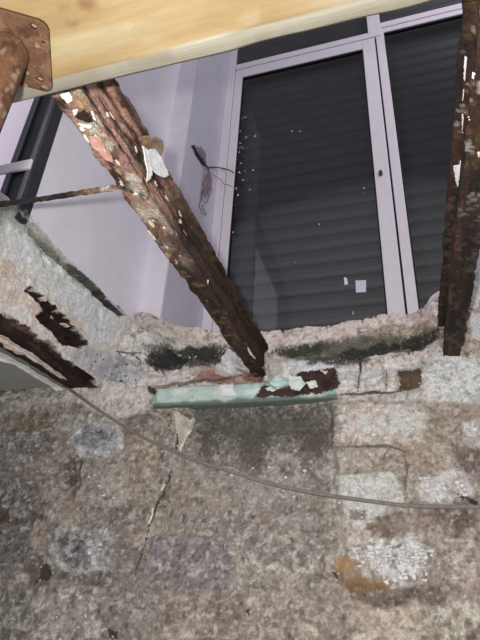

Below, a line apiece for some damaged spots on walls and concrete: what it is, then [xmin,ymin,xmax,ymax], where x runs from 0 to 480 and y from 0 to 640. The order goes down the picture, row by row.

peeling [60,92,125,186]
flaking render [0,335,67,392]
corrosion [0,314,99,389]
peeling [24,288,150,384]
leakage [144,343,235,375]
peeling [143,373,257,396]
corrosion [195,366,263,384]
peeling [255,366,340,399]
leakage [275,327,440,365]
spalling [397,369,422,392]
crack [135,472,171,575]
corrosion [336,554,390,592]